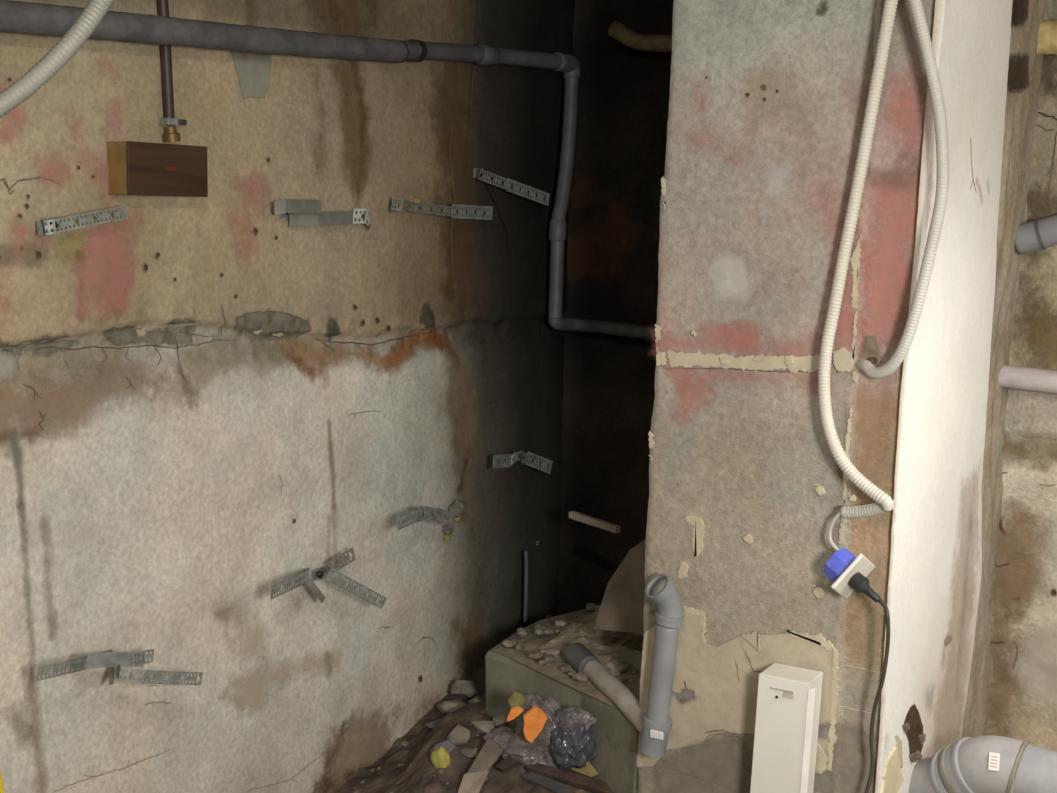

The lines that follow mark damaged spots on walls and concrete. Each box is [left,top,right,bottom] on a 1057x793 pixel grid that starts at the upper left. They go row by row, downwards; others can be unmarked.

damp [337,67,369,187]
crack [0,176,61,195]
spalling [0,336,74,356]
crack [2,305,235,430]
spalling [104,318,214,345]
spalling [235,311,311,340]
spalling [325,318,340,339]
rust [282,330,455,377]
spalling [420,303,434,330]
damp [0,370,157,552]
peeling [785,629,926,793]
damp [16,677,45,793]